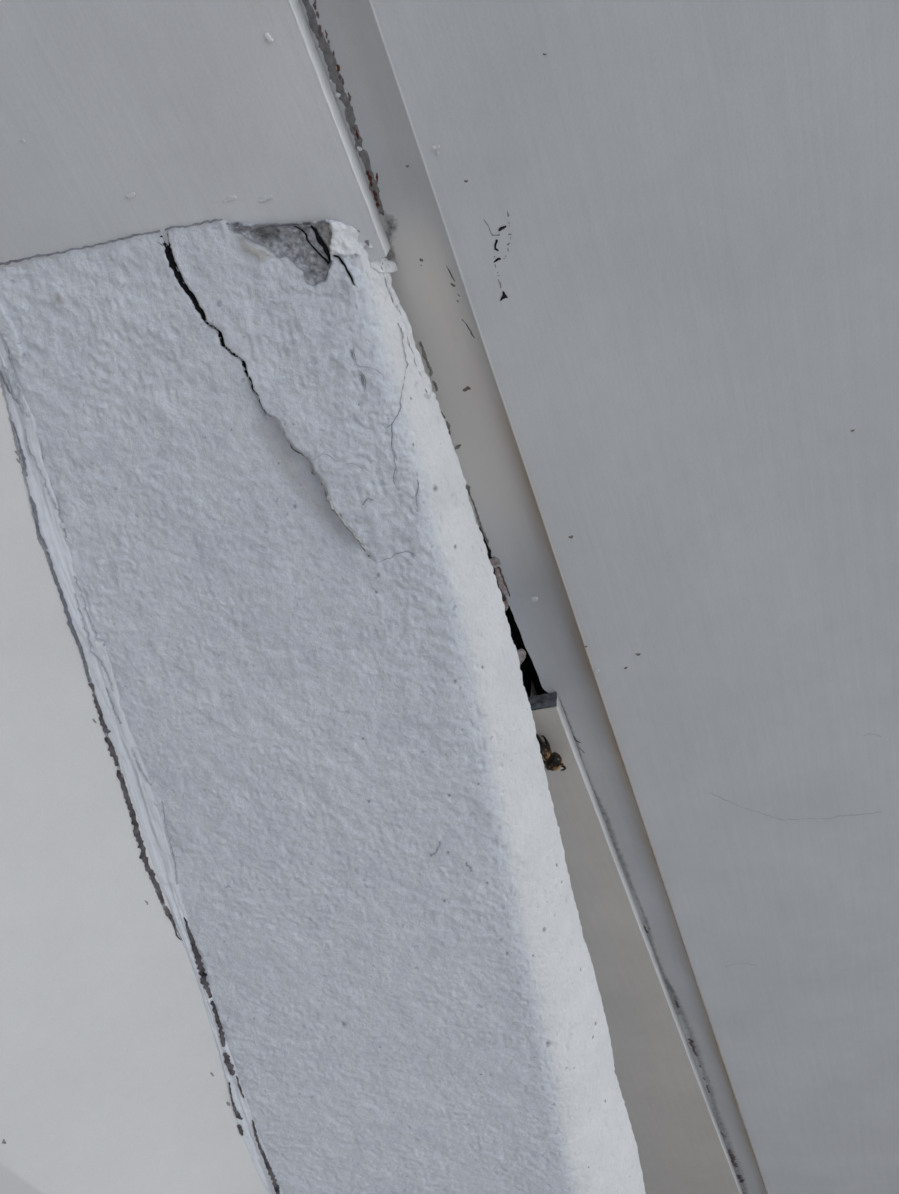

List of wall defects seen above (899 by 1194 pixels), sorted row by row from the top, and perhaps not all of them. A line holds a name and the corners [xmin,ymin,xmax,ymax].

crack [0,219,411,562]
spalling [226,221,397,286]
crack [0,370,280,1194]